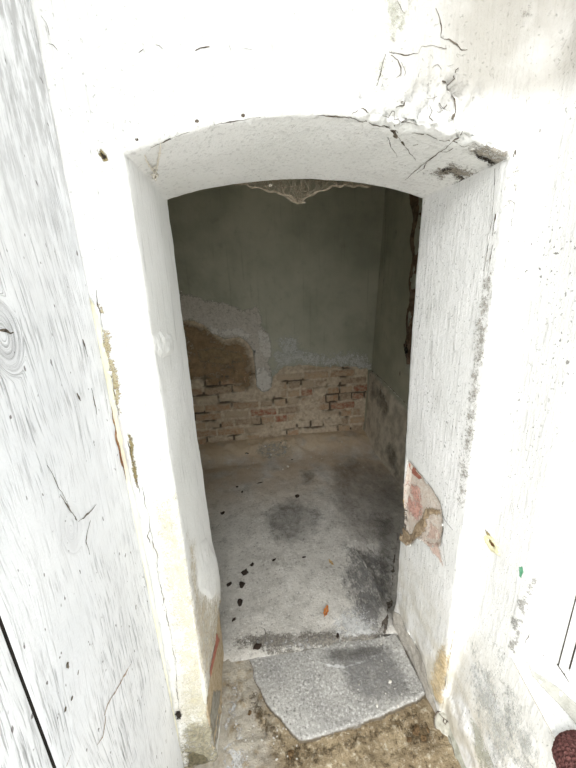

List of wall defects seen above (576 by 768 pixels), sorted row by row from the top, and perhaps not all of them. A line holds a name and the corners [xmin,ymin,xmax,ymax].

crack [373,9,466,180]
flaking render [403,194,423,364]
flaking render [179,291,368,444]
spalling [399,462,443,562]
leakage [333,548,390,642]